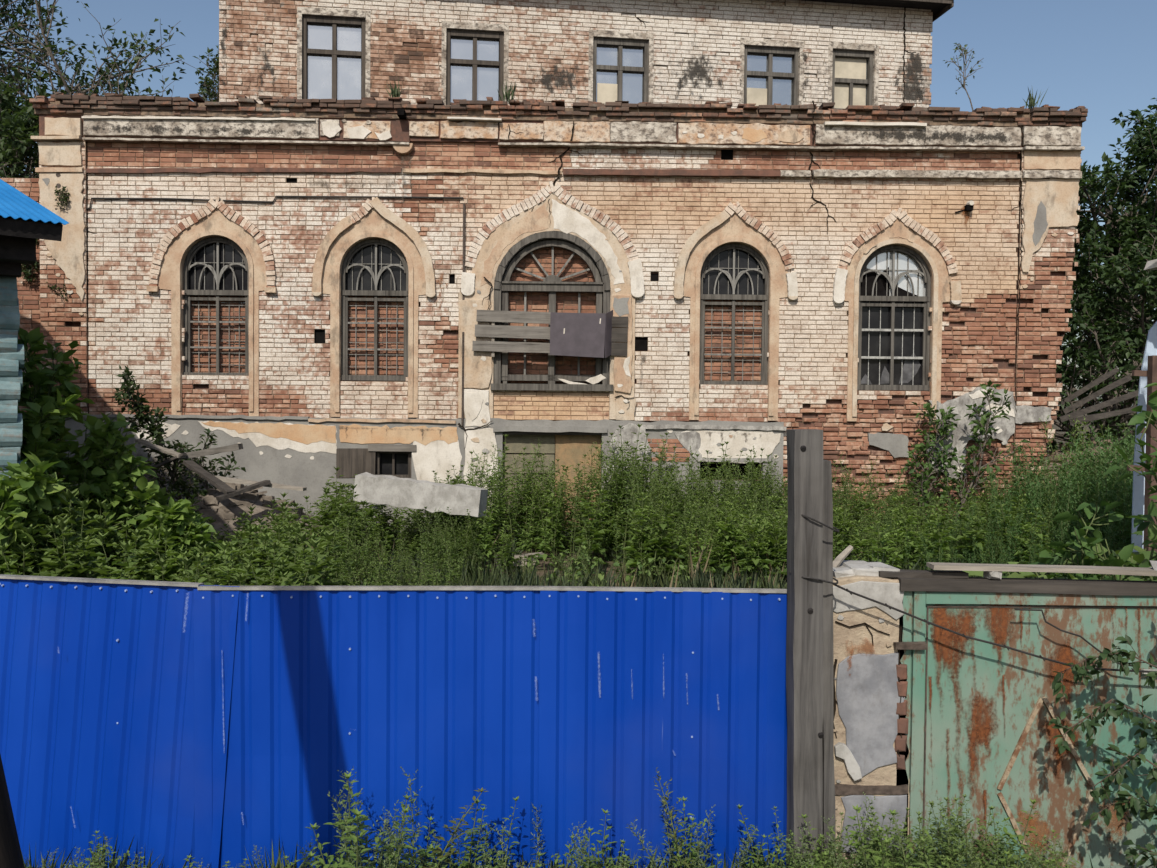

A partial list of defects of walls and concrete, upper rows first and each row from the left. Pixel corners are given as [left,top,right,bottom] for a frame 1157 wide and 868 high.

damp [529,64,578,95]
damp [676,34,723,98]
damp [895,52,927,104]
crack [531,121,582,223]
crack [808,101,836,234]
peeling [38,172,490,483]
spalling [928,178,1079,404]
spalling [647,391,1052,527]
spalling [834,642,909,783]
rust [929,604,1031,832]
rust [1049,642,1092,703]
rust [1112,606,1142,696]